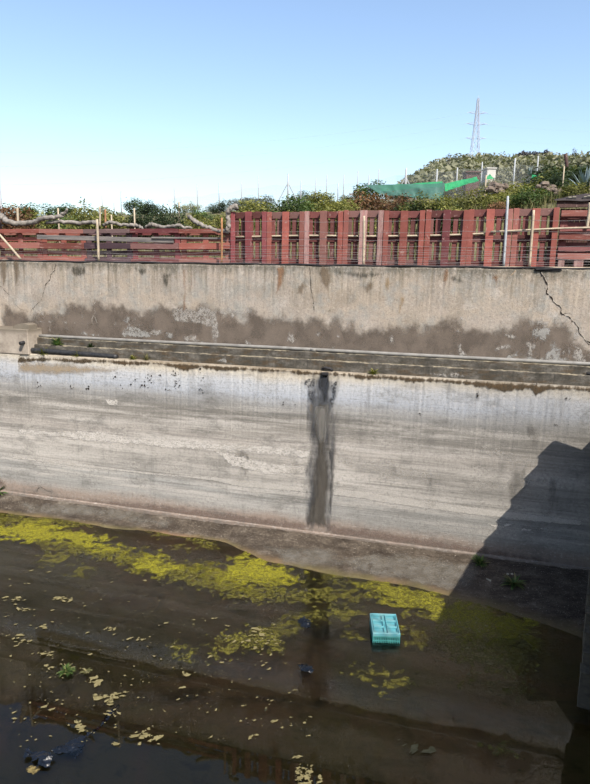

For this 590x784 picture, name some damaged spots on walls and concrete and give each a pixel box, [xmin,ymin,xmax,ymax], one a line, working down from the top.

damp [3,302,590,362]
crack [540,271,590,345]
damp [12,376,581,531]
damp [332,528,506,555]